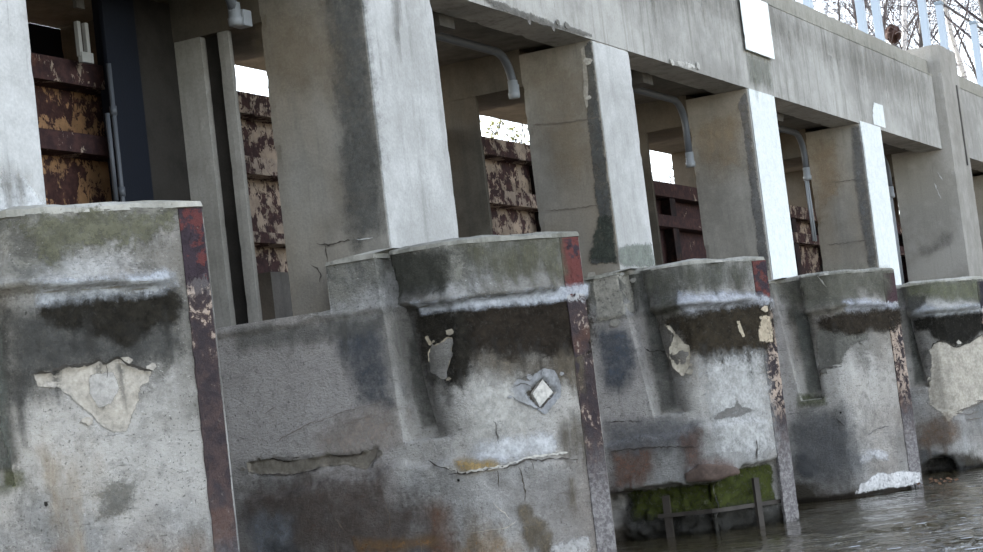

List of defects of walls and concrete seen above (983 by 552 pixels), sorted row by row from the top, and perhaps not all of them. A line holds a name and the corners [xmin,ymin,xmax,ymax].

damp [3,271,183,421]
peeling [34,357,157,432]
peeling [425,329,454,381]
peeling [666,325,693,376]
damp [816,296,983,346]
peeling [926,335,983,422]
crack [260,451,363,476]
spalling [442,452,568,474]
damp [626,495,780,540]